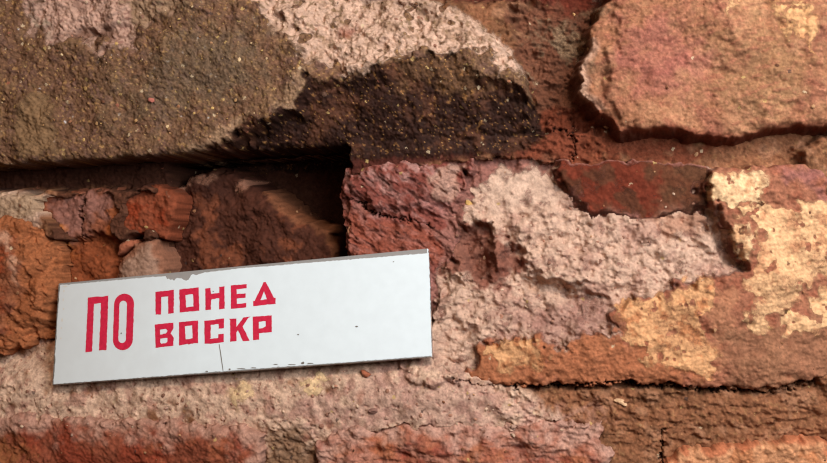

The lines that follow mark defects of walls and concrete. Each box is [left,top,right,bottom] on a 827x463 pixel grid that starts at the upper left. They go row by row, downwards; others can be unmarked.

spalling [432,160,827,381]